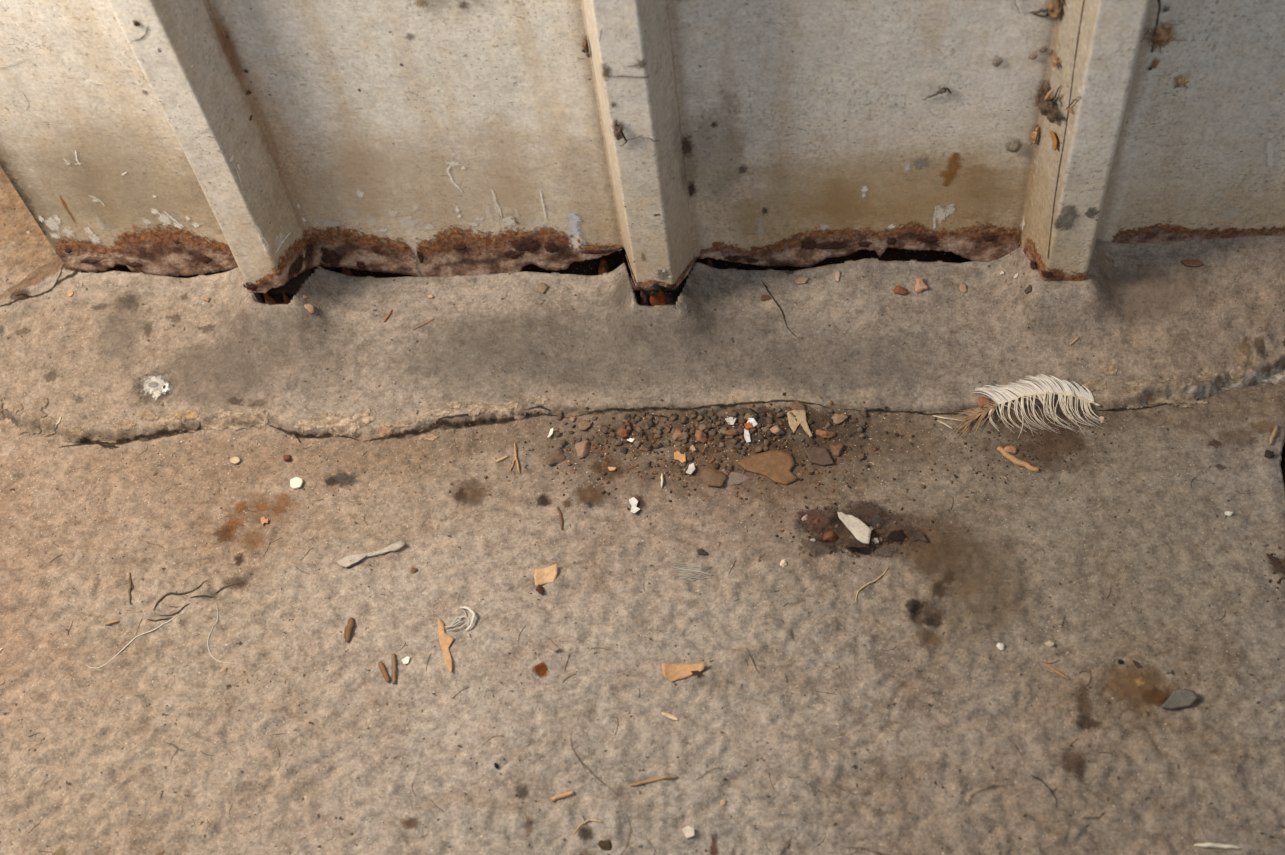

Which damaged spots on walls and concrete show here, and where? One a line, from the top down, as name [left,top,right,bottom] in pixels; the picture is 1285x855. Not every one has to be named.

rust [54,224,238,276]
rust [243,221,1088,294]
rust [1112,221,1285,244]
crack [62,423,201,448]
crack [268,400,958,443]